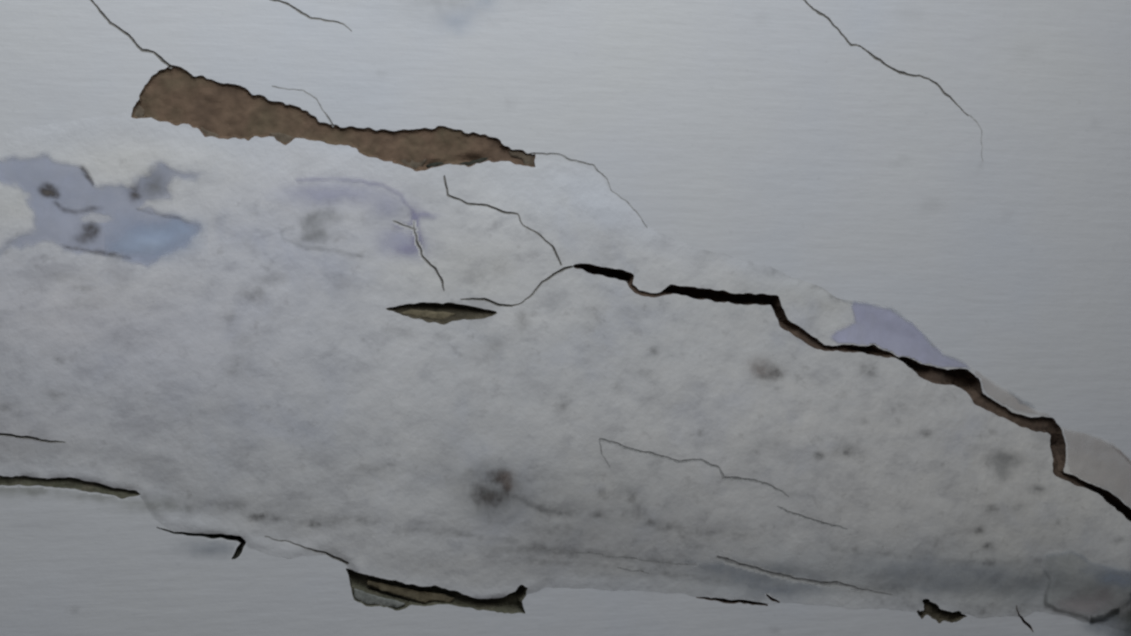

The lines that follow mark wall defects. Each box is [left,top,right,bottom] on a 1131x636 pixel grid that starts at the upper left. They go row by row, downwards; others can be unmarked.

crack [90,0,173,69]
crack [270,0,352,32]
crack [804,0,983,162]
flaking render [131,65,536,171]
peeling [0,157,199,265]
flaking render [386,302,497,325]
crack [392,175,1131,530]
peeling [833,303,966,367]
crack [0,433,66,443]
crack [0,475,140,499]
flaking render [265,536,527,614]
flaking render [916,599,967,623]